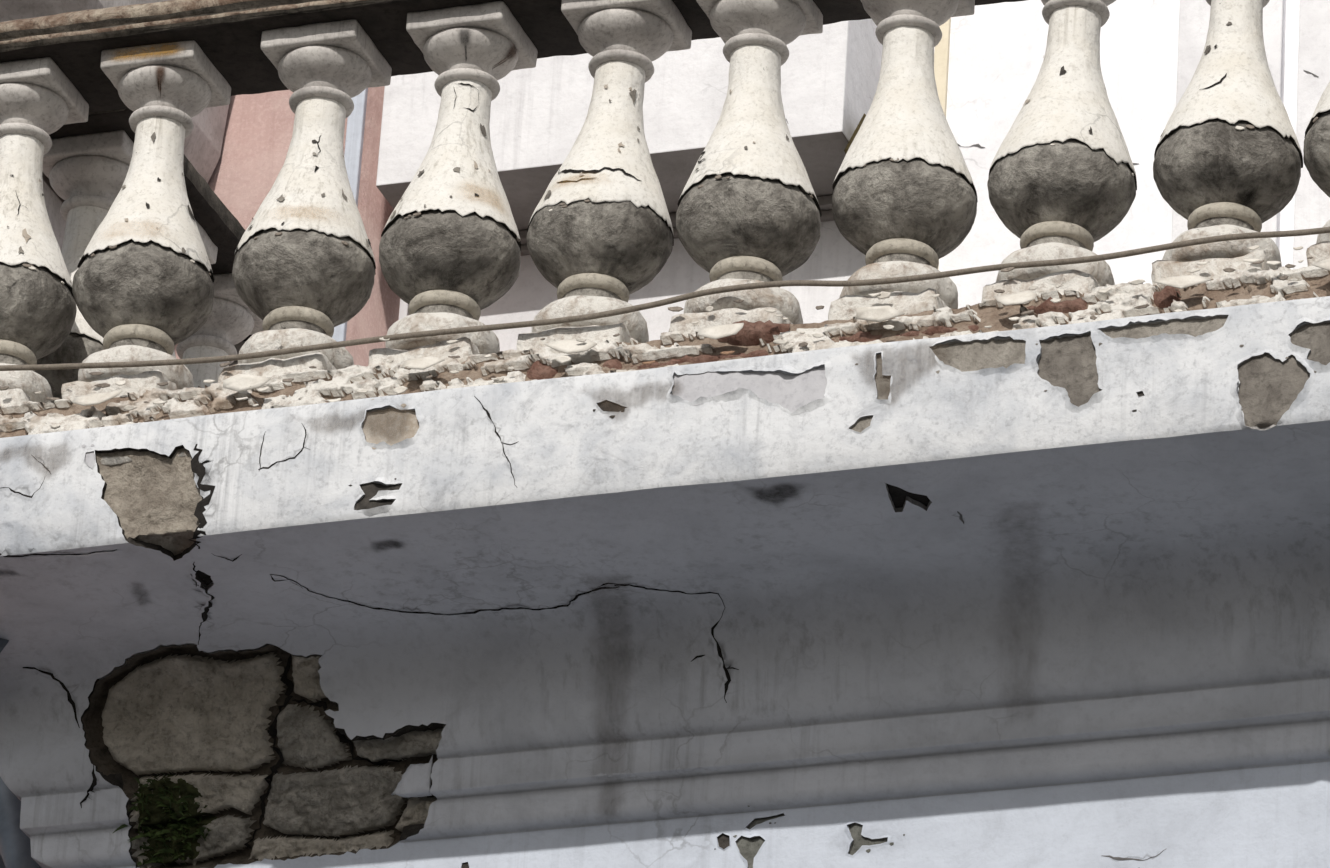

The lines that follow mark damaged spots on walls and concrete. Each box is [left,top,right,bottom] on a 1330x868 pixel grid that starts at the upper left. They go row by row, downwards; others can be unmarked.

flaking render [232,126,1136,327]
flaking render [1153,112,1330,223]
flaking render [0,226,215,360]
flaking render [491,338,597,383]
peeling [603,245,1330,434]
spalling [81,444,203,561]
crack [189,444,242,645]
crack [474,396,519,487]
crack [23,667,80,730]
spalling [81,645,446,868]
crack [269,574,739,705]
peeling [714,806,787,868]